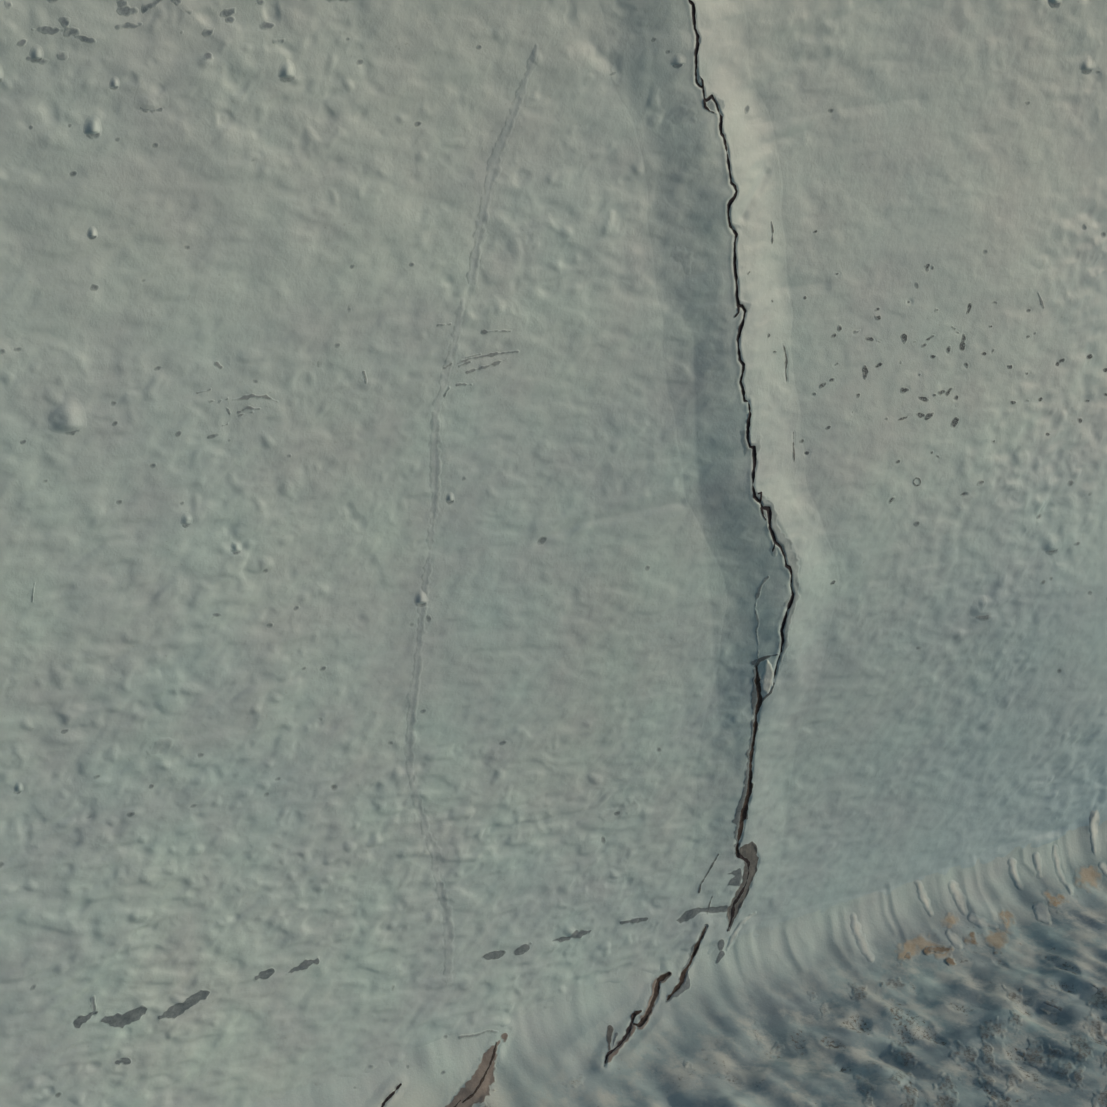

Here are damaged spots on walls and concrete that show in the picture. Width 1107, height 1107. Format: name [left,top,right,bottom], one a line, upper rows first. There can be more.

crack [602,0,801,1068]
spalling [619,916,649,925]
spalling [481,942,533,960]
spalling [551,928,592,944]
rust [894,928,1010,967]
spalling [253,956,320,982]
spalling [73,989,211,1029]
crack [380,1082,403,1107]